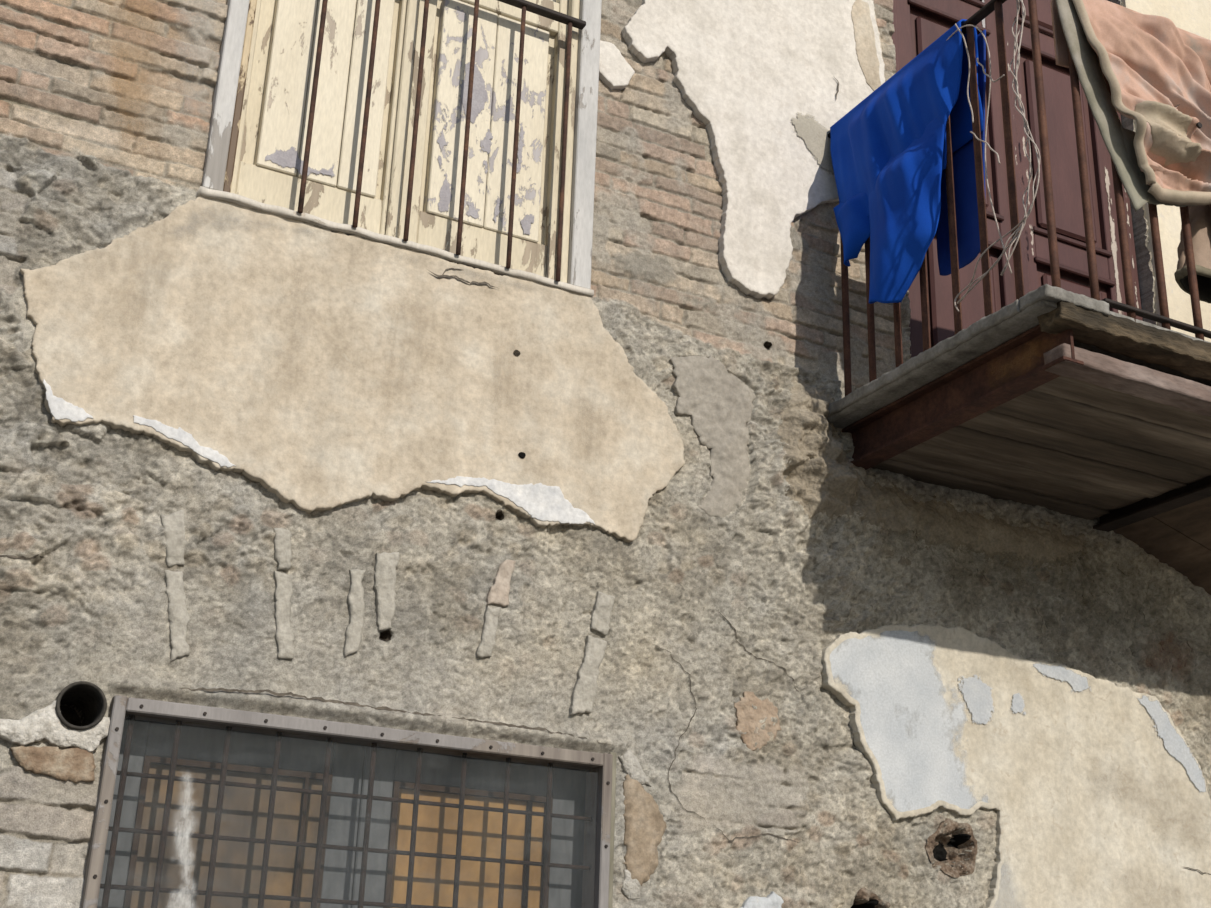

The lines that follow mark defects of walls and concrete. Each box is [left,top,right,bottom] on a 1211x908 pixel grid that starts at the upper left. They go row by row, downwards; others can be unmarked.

flaking render [599,0,885,299]
flaking render [20,195,685,543]
flaking render [160,510,190,661]
flaking render [821,624,1211,908]